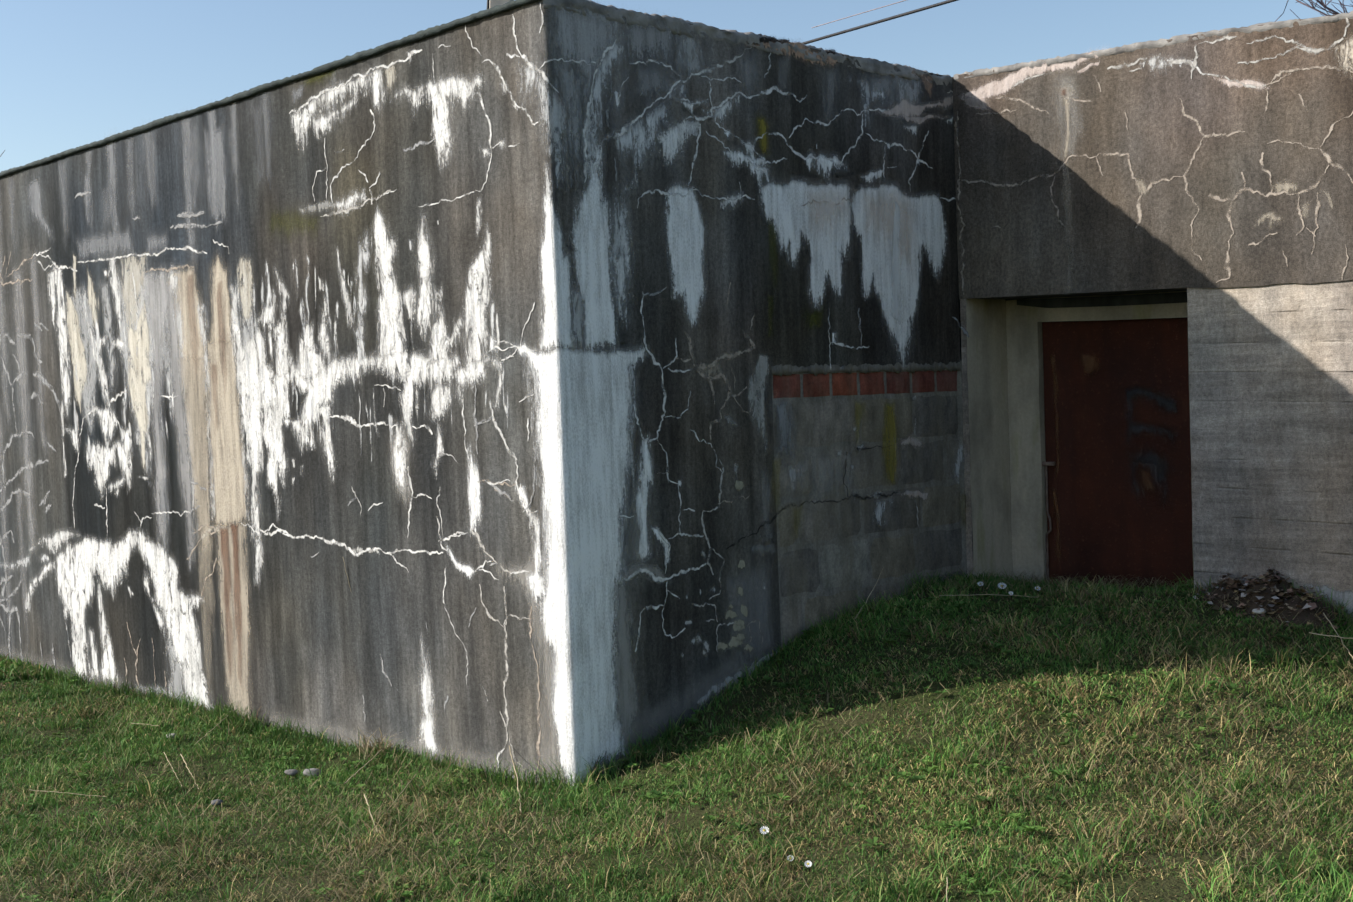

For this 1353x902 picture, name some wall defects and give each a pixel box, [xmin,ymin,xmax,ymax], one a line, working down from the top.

crack [0,322,71,666]
crack [0,211,228,286]
crack [187,383,545,778]
damp [0,10,803,788]
crack [496,302,535,361]
crack [616,282,919,652]
crack [312,3,1353,338]
damp [761,180,955,365]
damp [1336,38,1353,73]